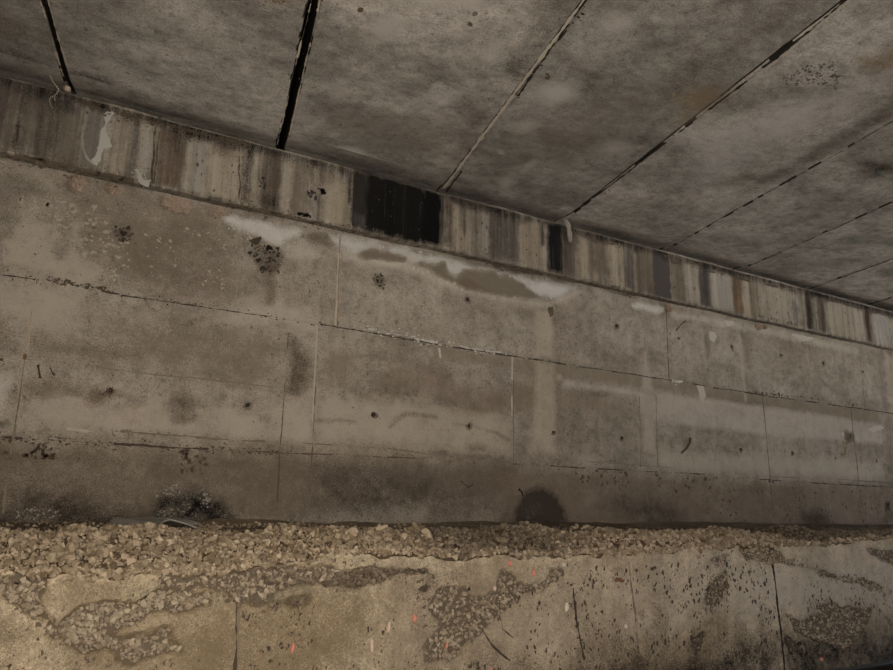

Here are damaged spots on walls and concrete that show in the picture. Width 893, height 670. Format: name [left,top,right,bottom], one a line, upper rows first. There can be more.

leakage [310,0,591,179]
spalling [783,61,841,90]
peeling [1,196,185,287]
hole [247,237,283,274]
leakage [0,67,893,524]